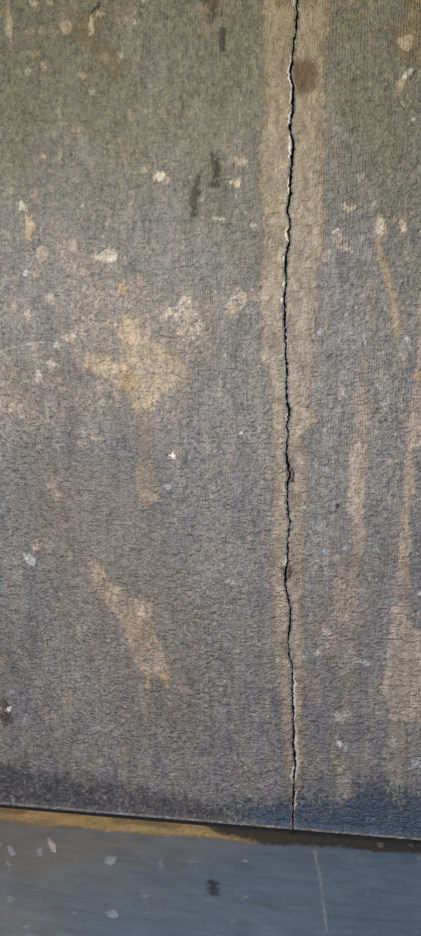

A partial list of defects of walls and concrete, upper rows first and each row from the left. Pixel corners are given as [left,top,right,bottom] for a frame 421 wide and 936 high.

peeling [0,188,214,447]
peeling [226,287,255,317]
crack [280,0,300,835]
peeling [23,460,204,730]
peeling [380,605,421,725]